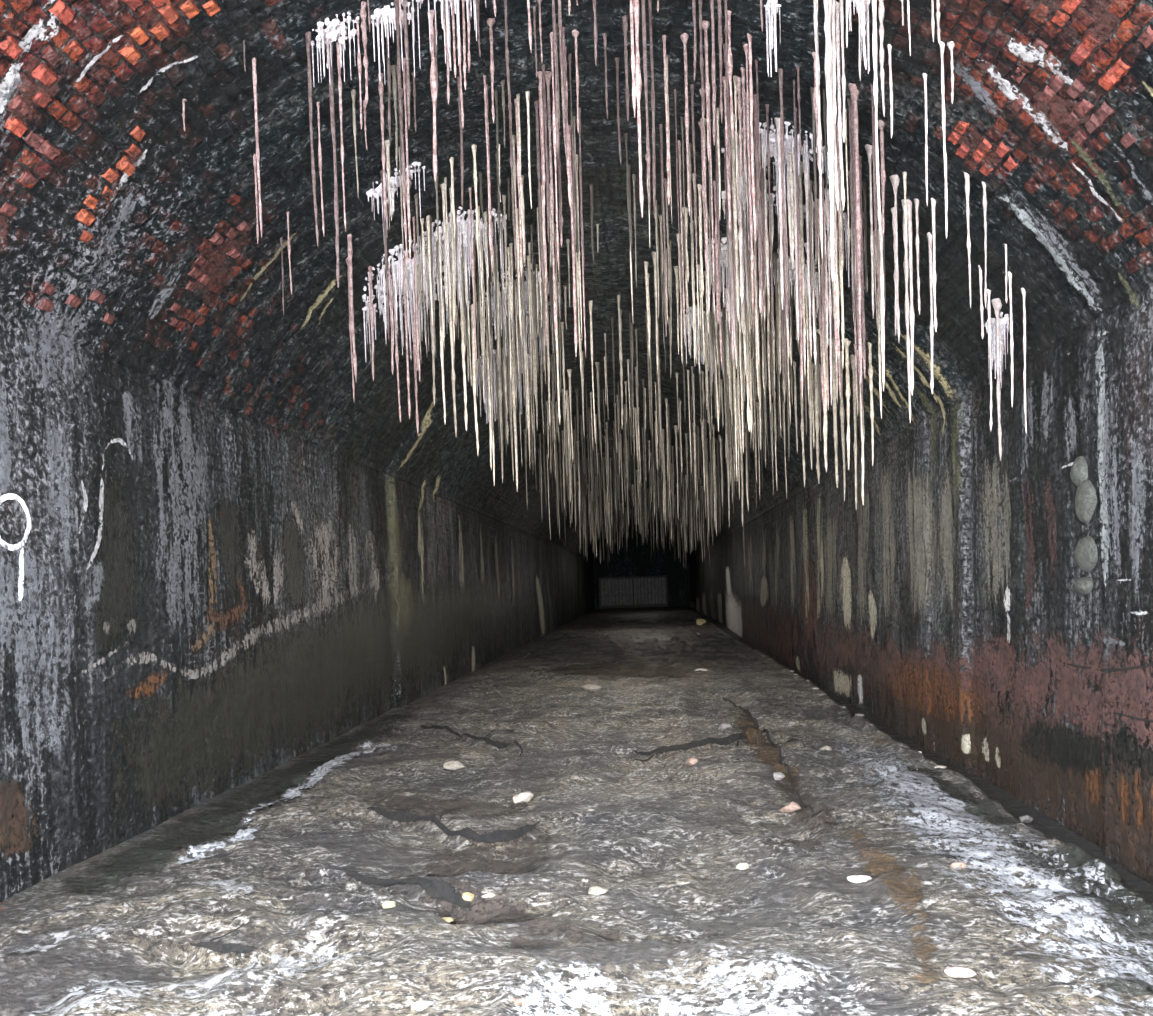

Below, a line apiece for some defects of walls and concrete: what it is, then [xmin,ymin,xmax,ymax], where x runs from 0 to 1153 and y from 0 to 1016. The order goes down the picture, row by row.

spalling [0,0,221,160]
efflorescence [311,0,486,82]
spalling [1002,0,1133,146]
spalling [75,126,146,243]
damp [362,162,560,423]
damp [985,164,1146,596]
damp [0,371,552,897]
crack [367,805,541,843]
crack [417,725,522,756]
crack [634,694,814,813]
rust [737,556,1153,886]
rust [837,827,939,983]